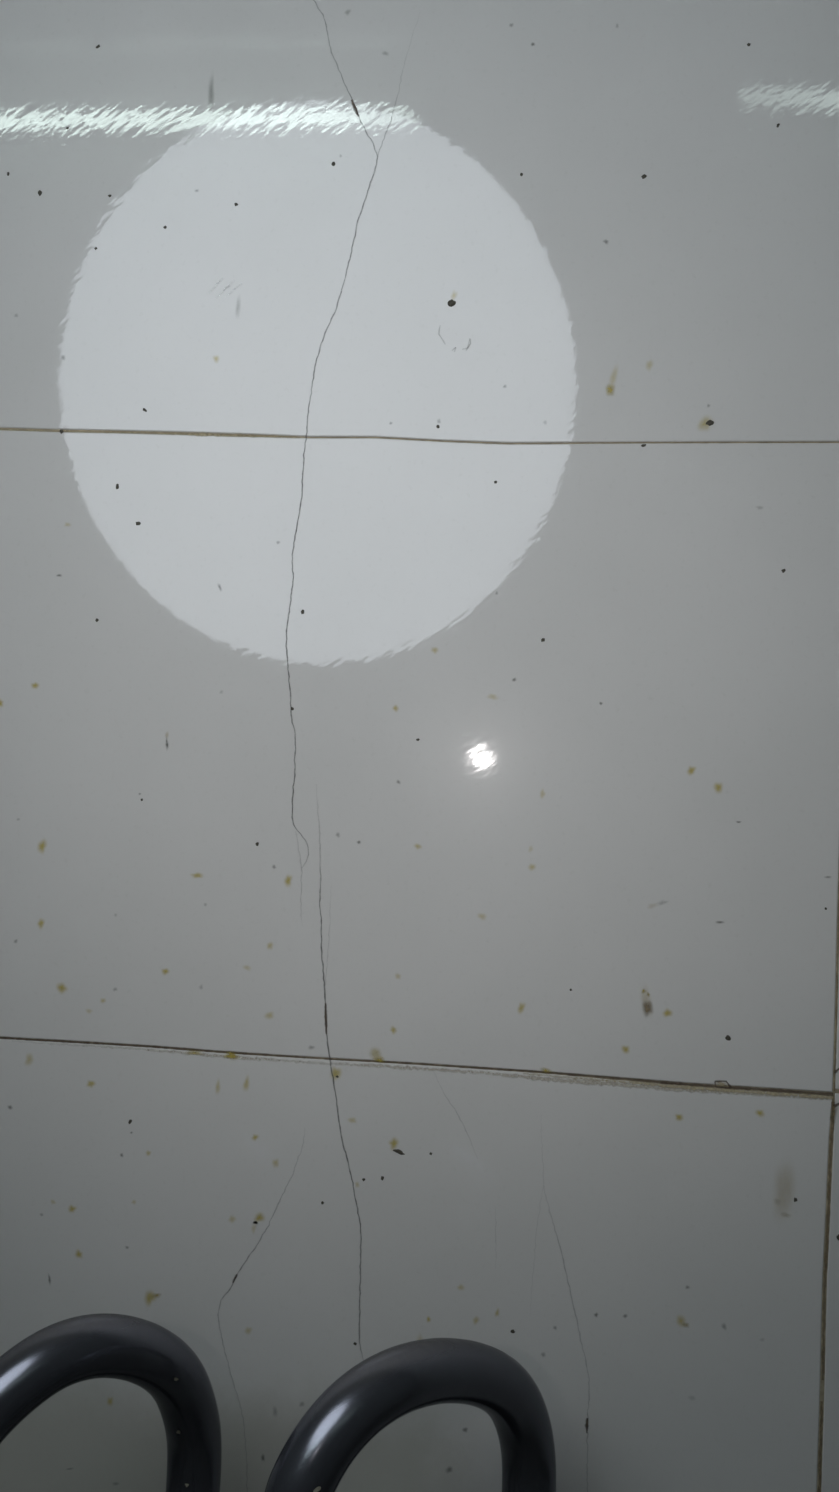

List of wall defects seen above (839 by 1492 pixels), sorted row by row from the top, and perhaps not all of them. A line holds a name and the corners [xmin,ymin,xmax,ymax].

crack [319,900,361,1325]